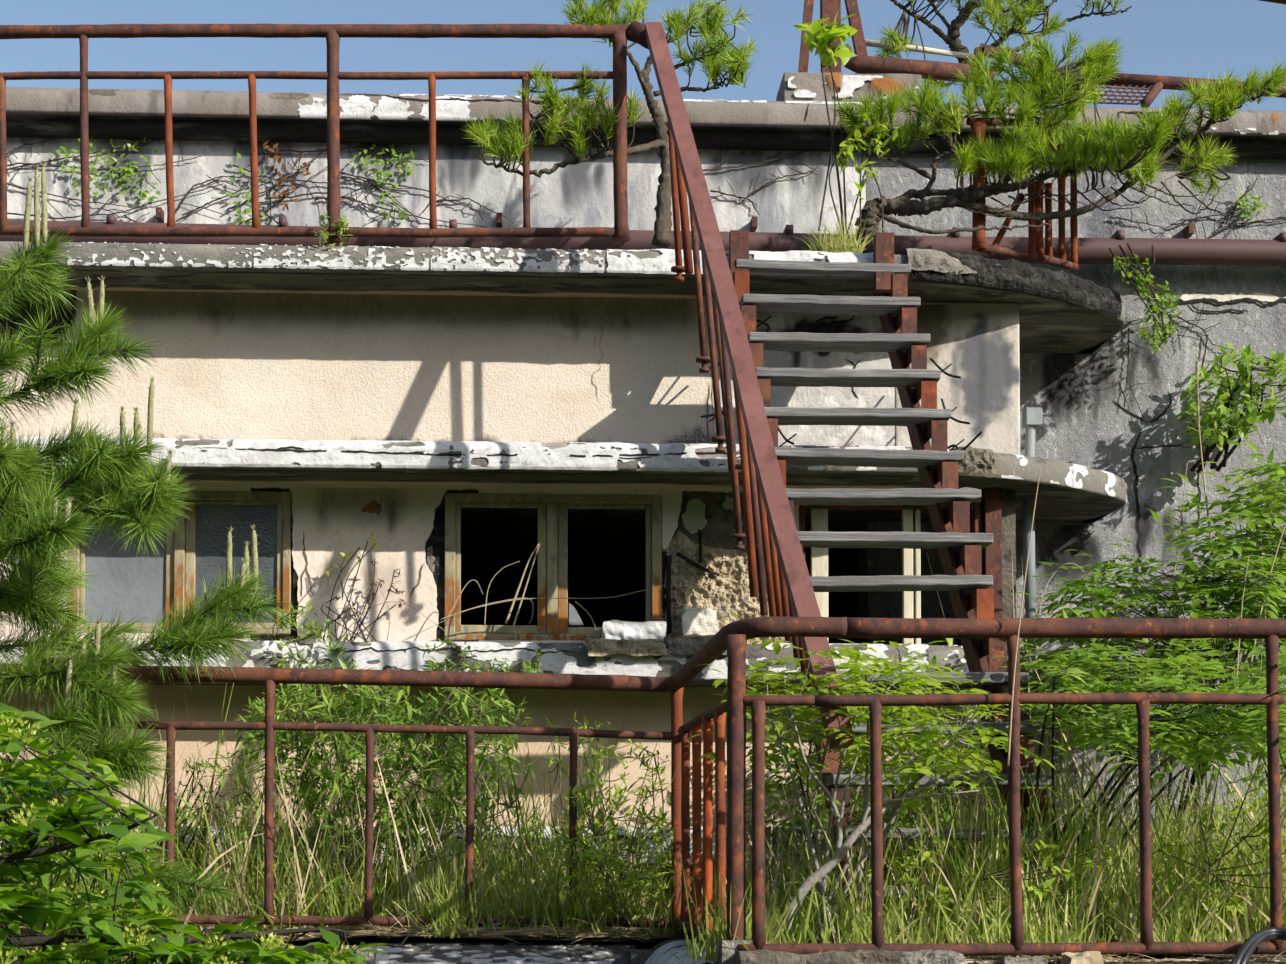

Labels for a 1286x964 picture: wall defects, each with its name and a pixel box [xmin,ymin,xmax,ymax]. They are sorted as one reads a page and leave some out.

damp [234,141,265,170]
damp [349,144,406,174]
damp [564,154,602,194]
damp [714,151,796,191]
peeling [749,250,874,277]
crack [1133,296,1286,313]
crack [592,306,607,400]
peeling [1049,463,1127,503]
crack [1112,390,1201,578]
peeling [101,438,769,679]
peeling [829,643,969,672]
peeling [375,941,615,964]